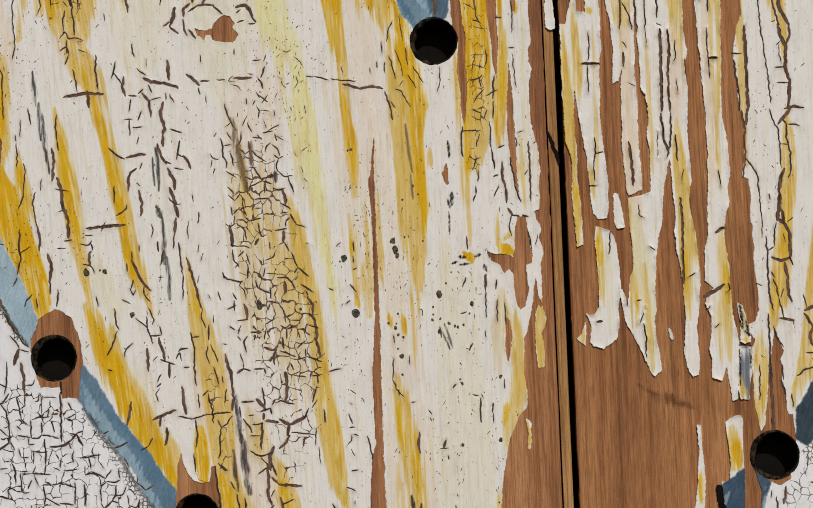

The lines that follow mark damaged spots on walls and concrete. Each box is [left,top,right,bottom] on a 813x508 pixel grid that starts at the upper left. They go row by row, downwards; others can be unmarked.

peeling [195,15,238,43]
peeling [449,0,467,124]
peeling [485,0,498,75]
crack [581,33,600,92]
crack [460,1,560,251]
crack [618,0,695,284]
crack [0,0,449,508]
peeling [368,139,387,508]
crack [461,274,507,351]
peeling [488,0,796,508]
crack [715,485,726,508]
crack [771,486,787,508]